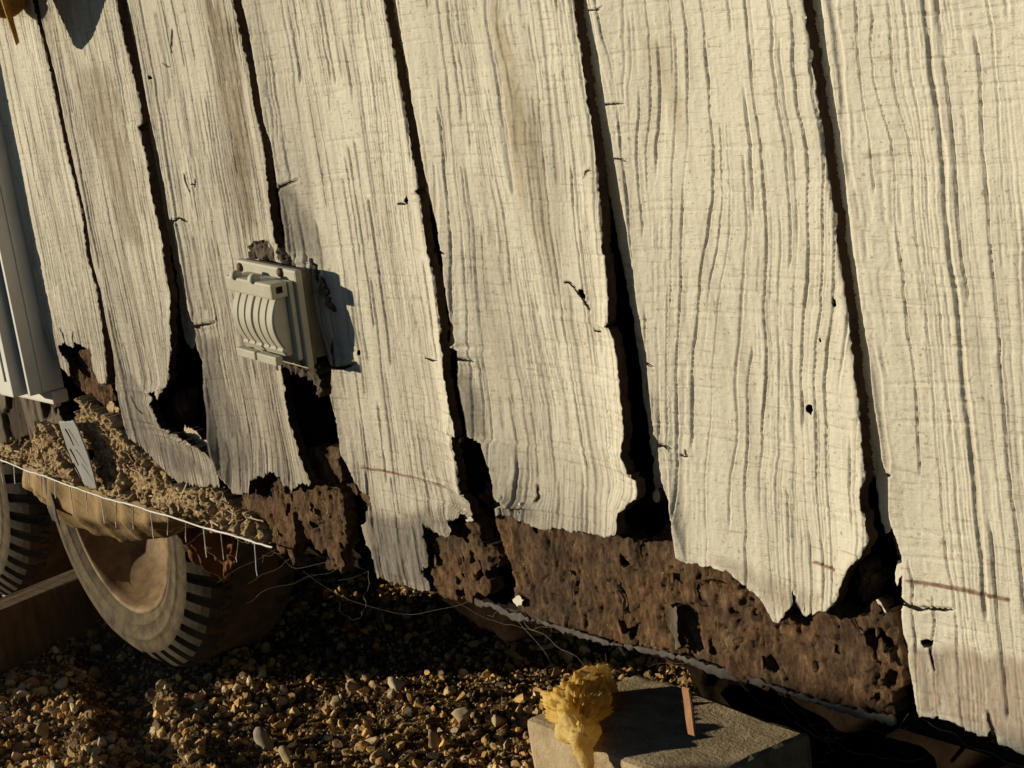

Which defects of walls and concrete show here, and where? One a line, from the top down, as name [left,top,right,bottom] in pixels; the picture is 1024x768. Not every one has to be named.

crack [564,281,600,333]
peeling [893,536,903,586]
peeling [513,594,527,606]
peeling [876,598,891,613]
peeling [875,627,893,665]